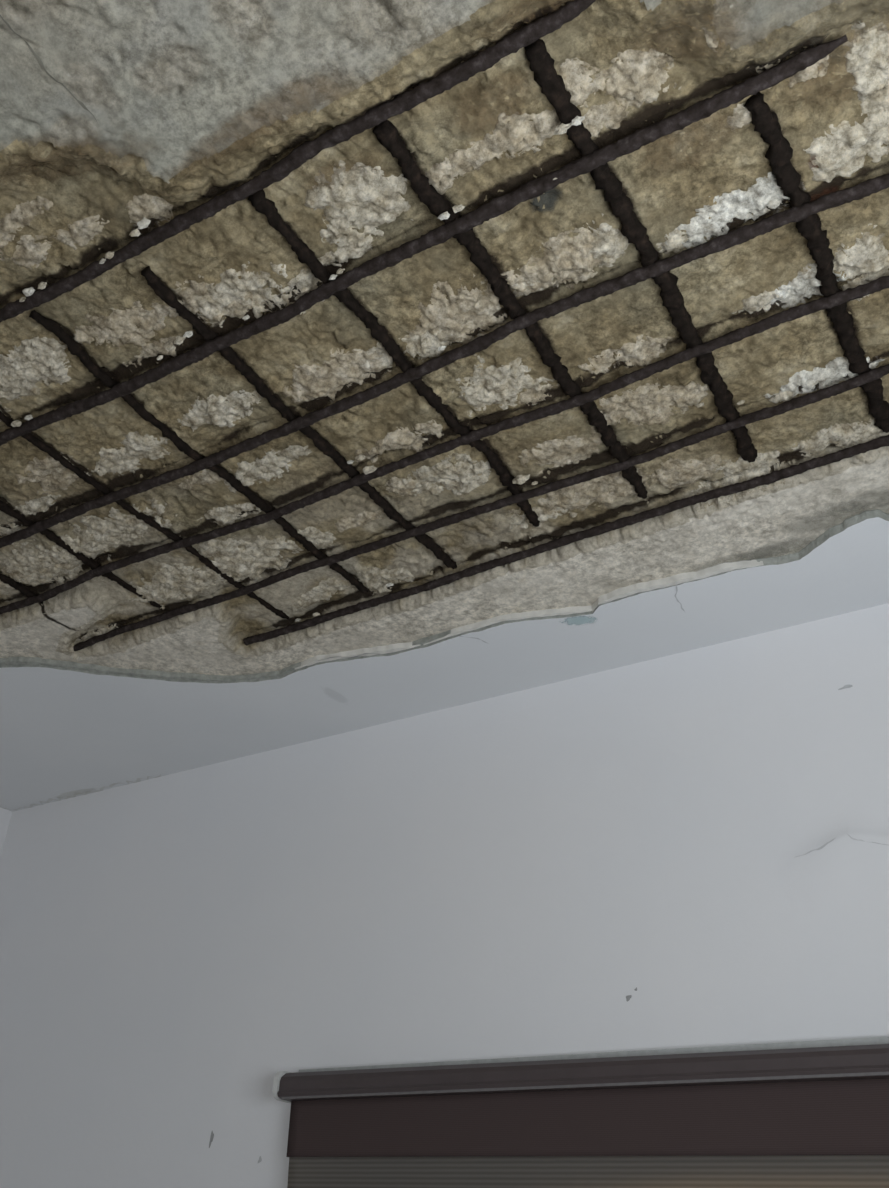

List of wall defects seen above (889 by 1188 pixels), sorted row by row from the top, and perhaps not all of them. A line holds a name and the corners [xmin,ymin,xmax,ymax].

crack [0,15,99,125]
water stain [532,189,560,212]
peeling [0,0,889,681]